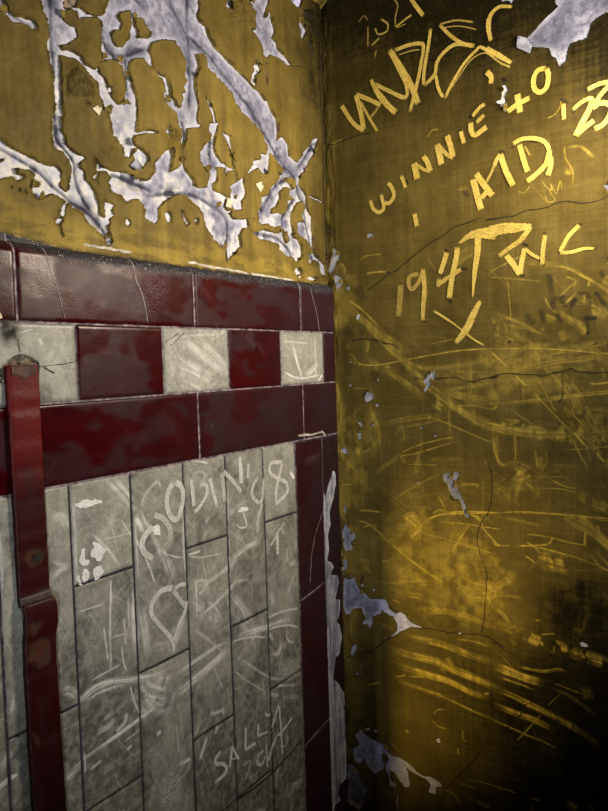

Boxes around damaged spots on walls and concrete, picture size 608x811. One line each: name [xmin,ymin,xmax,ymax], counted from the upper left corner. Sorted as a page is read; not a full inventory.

peeling [517,0,608,66]
peeling [497,85,508,112]
peeling [0,0,350,291]
crack [369,197,607,290]
crack [435,368,608,403]
peeling [443,471,470,518]
peeling [323,471,442,811]
crack [424,498,608,811]